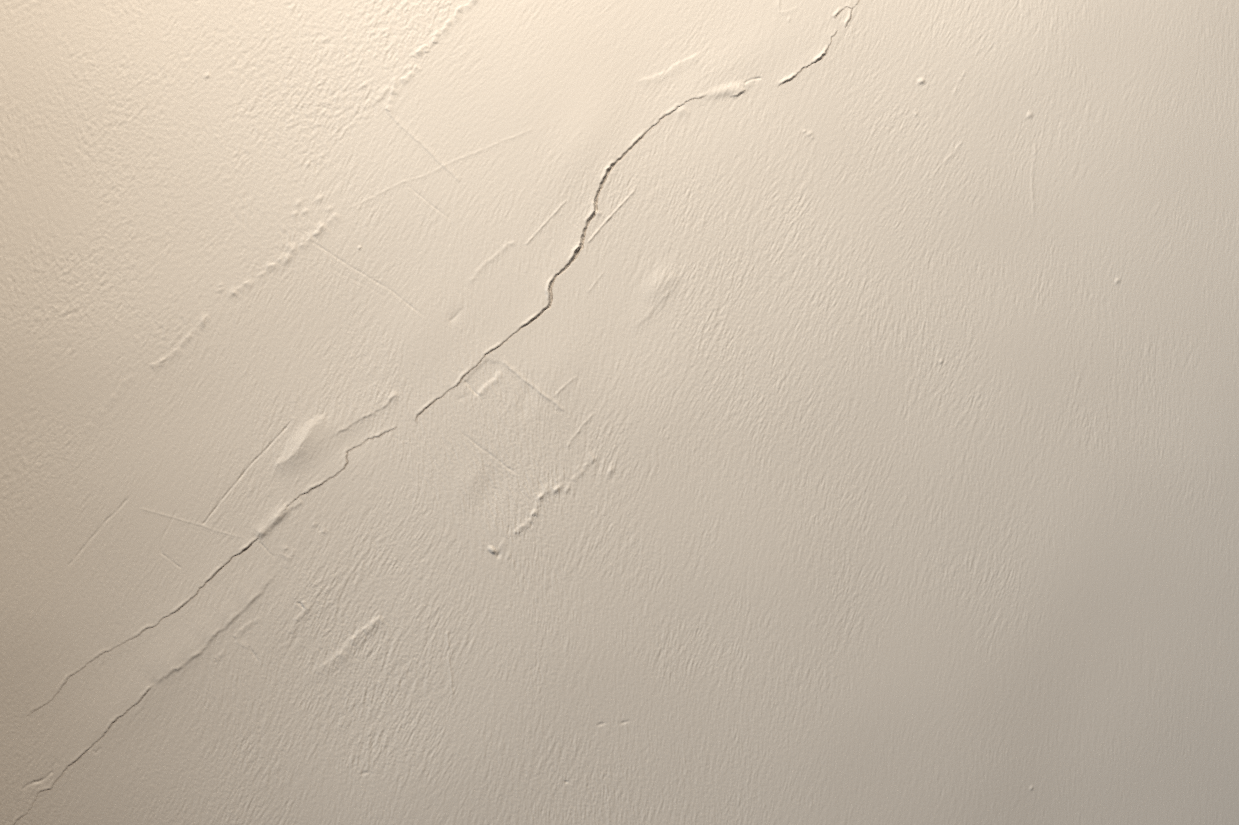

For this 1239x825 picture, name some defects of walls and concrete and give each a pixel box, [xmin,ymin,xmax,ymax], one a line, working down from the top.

crack [0,0,873,825]